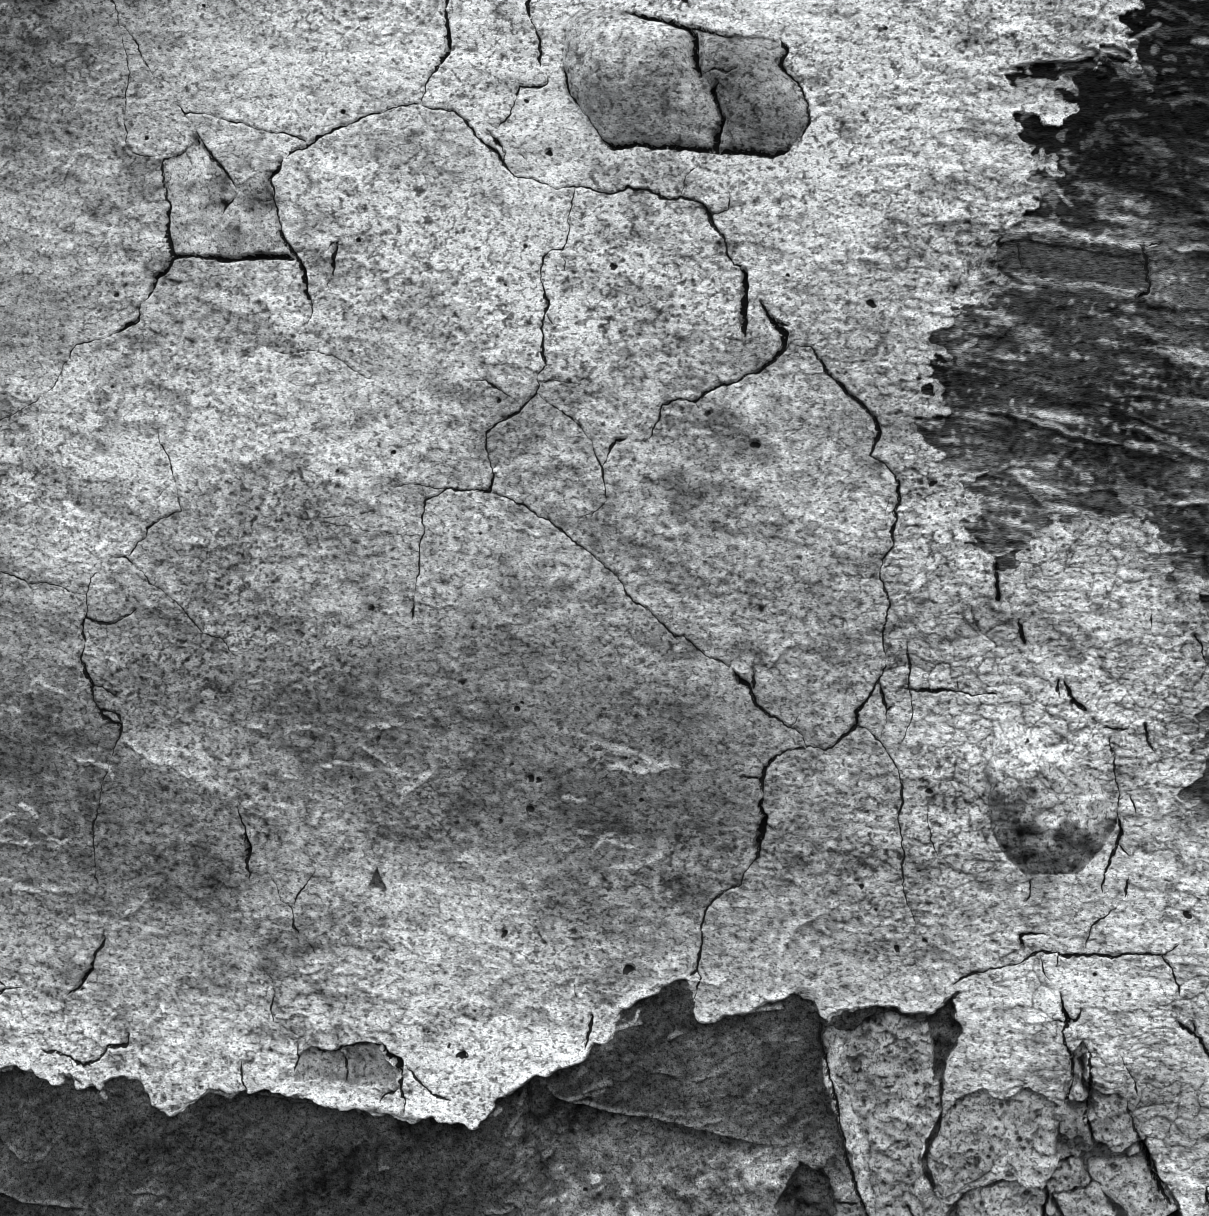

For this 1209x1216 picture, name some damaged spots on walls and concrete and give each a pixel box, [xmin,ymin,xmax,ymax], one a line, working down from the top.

flaking render [915,0,1209,618]
crack [0,0,997,1001]
crack [993,565,1027,644]
crack [1194,635,1208,666]
spalling [1177,707,1209,814]
crack [953,679,1209,1206]
crack [41,1034,130,1082]
crack [264,970,451,1112]
crack [574,985,594,1048]
flaking render [0,979,1179,1216]